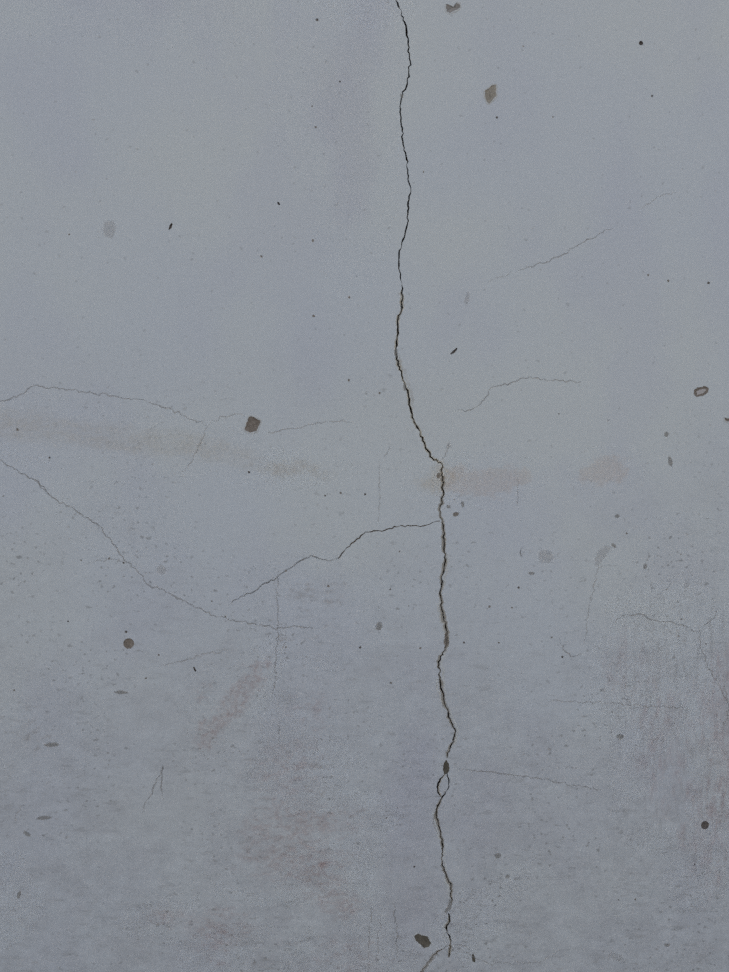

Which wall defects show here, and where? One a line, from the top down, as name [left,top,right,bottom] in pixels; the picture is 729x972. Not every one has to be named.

crack [338,0,459,972]